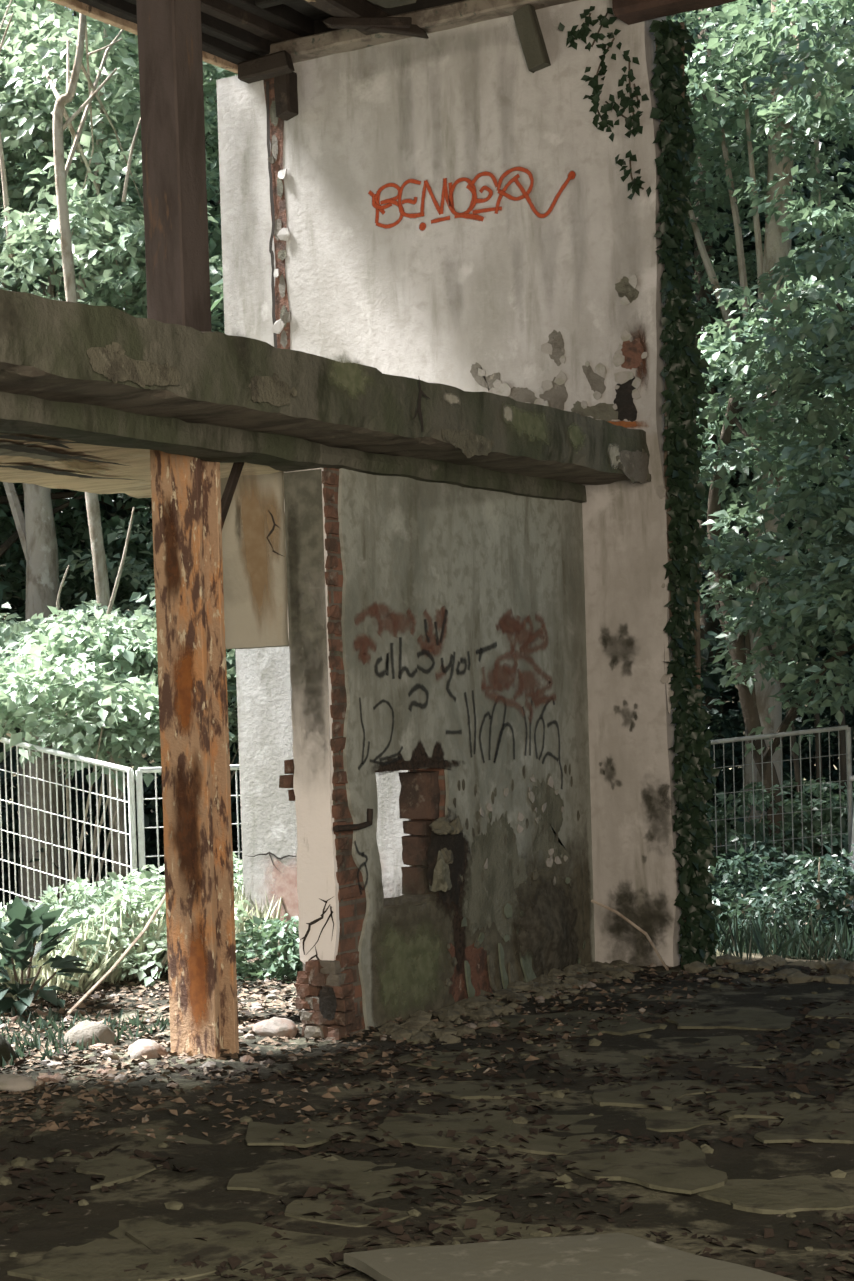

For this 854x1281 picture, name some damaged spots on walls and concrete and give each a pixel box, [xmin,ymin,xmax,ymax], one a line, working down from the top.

flaking render [615,274,639,305]
spalling [470,329,648,422]
flaking render [322,471,363,900]
flaking render [383,764,580,998]
flaking render [295,936,363,1040]